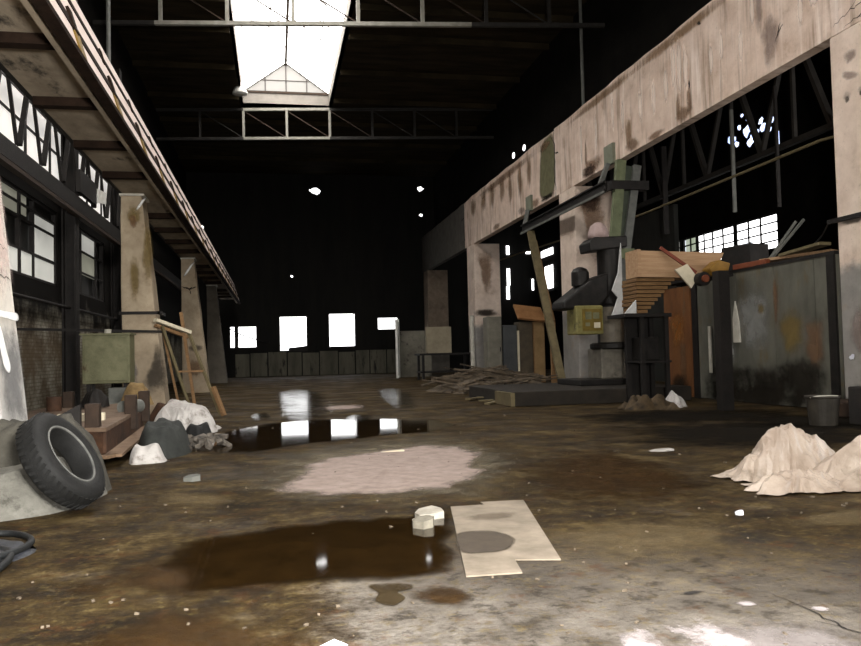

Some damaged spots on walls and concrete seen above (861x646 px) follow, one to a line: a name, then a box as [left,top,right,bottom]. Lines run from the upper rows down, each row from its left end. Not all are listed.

leakage [750,0,776,59]
crack [775,595,861,633]
efflorescence [624,631,656,646]
efflorescence [672,625,845,646]